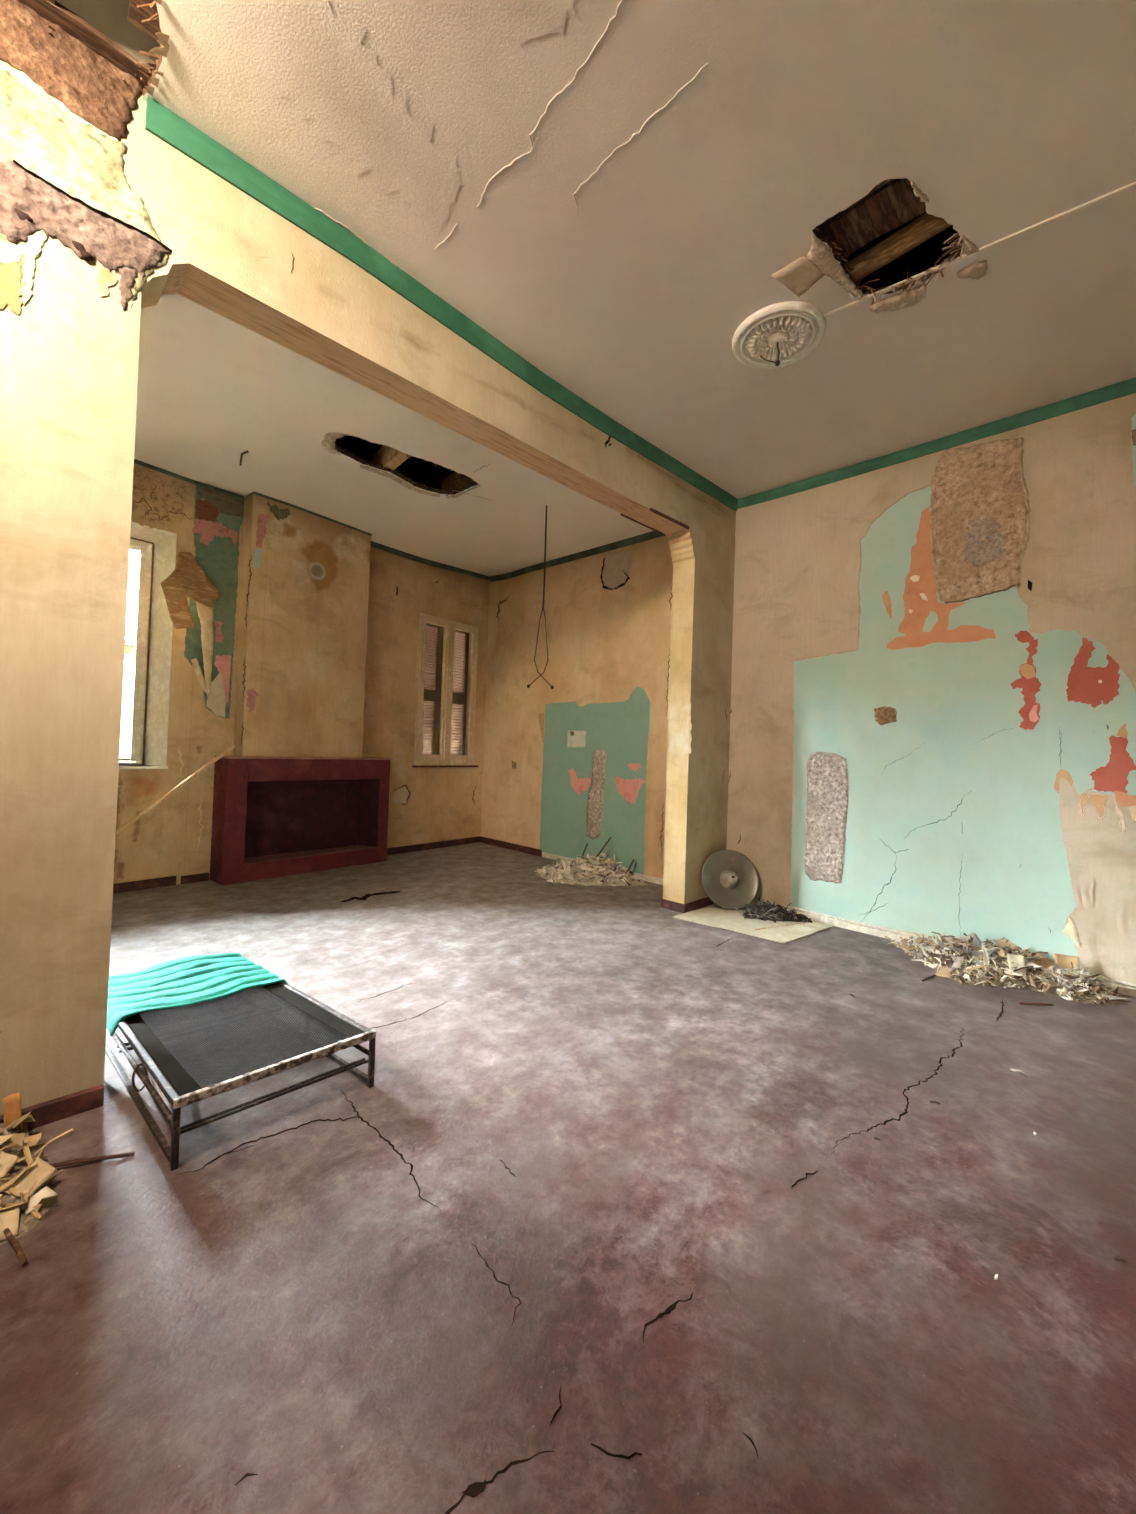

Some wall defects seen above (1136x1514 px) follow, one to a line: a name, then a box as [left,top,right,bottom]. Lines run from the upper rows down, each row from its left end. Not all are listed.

peeling [0,0,172,310]
crack [435,0,622,250]
crack [574,63,708,205]
flaking render [322,432,347,456]
peeling [184,485,290,719]
peeling [538,686,650,875]
peeling [790,437,1136,960]
crack [181,1091,440,1209]
crack [792,1000,1004,1187]
crack [643,1292,693,1343]
crack [445,1391,562,1514]
crack [591,1443,642,1460]